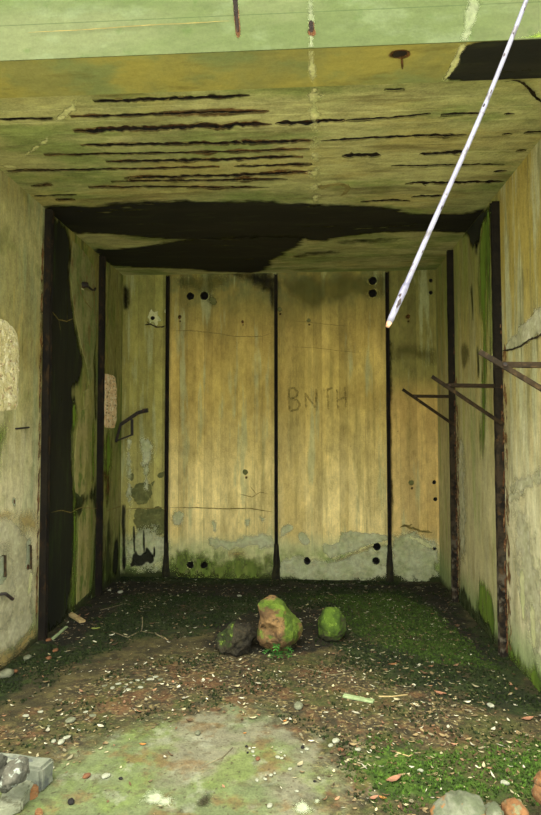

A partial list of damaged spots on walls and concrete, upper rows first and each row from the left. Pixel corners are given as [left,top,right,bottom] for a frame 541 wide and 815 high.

corrosion [389,50,410,69]
damp [445,0,541,81]
crack [506,80,541,102]
peeling [506,307,541,349]
spalling [0,319,20,411]
damp [41,89,490,632]
spalling [104,374,117,428]